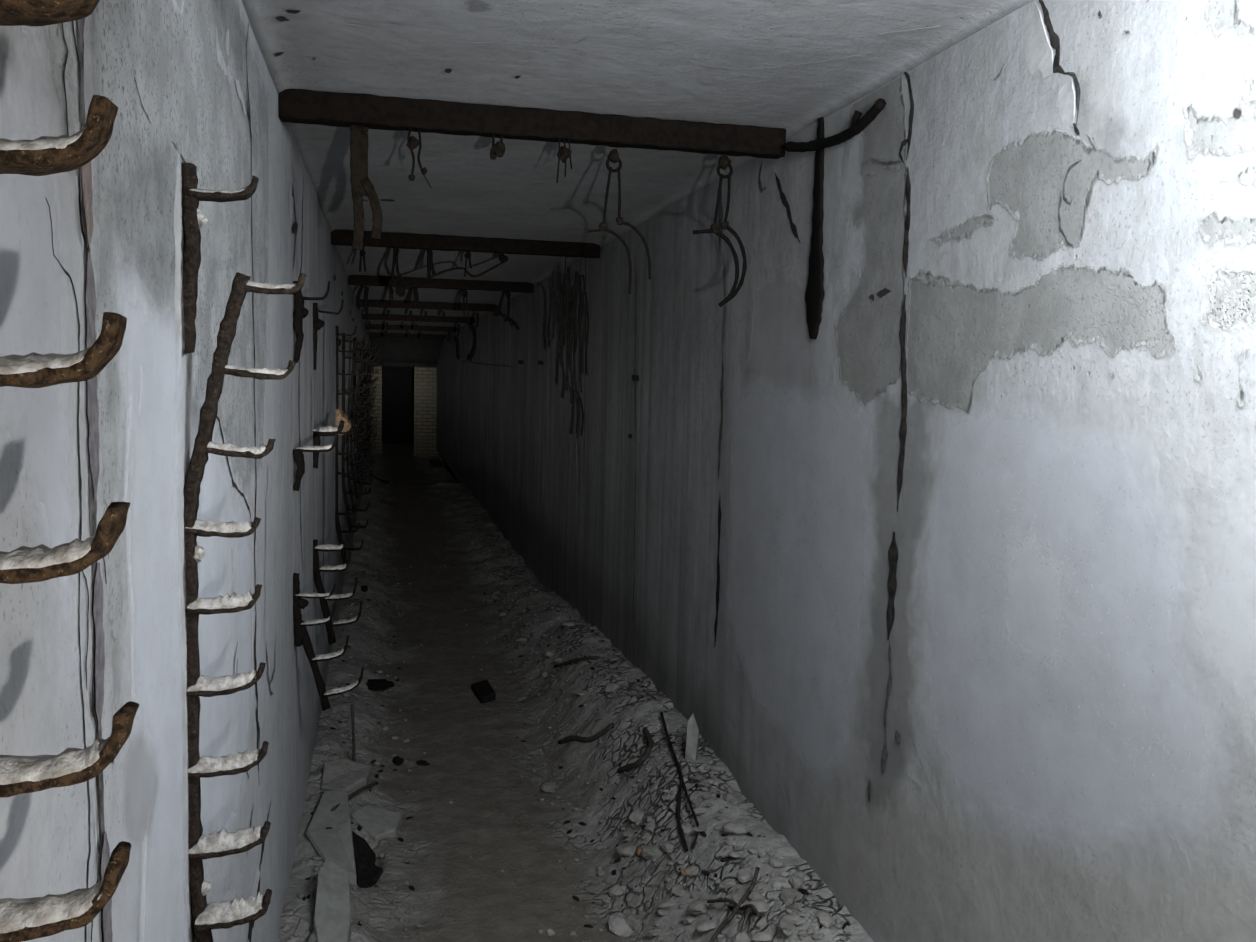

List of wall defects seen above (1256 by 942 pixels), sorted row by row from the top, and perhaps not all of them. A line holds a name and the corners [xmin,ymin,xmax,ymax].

crack [62,21,81,136]
crack [994,0,1096,245]
peeling [1183,69,1256,186]
peeling [1205,0,1256,51]
crack [45,167,90,352]
peeling [834,77,1176,414]
peeling [1198,210,1256,250]
spalling [1203,269,1256,330]
peeling [1236,379,1246,408]
crack [216,24,276,942]
crack [77,382,107,748]
crack [87,775,102,888]